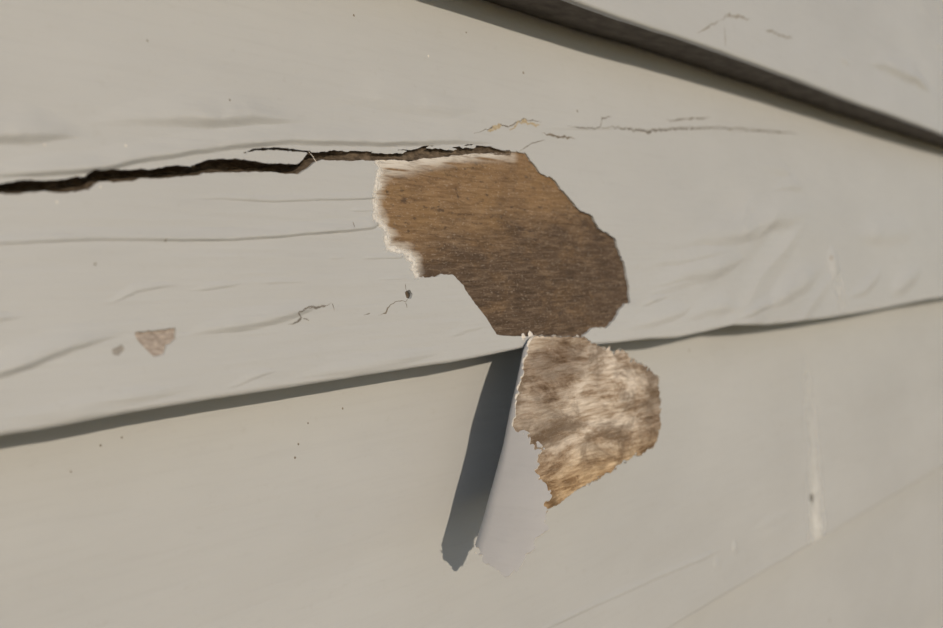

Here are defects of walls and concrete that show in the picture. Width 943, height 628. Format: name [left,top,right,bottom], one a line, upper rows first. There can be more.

crack [0,116,797,194]
peeling [135,328,174,357]
peeling [372,146,662,577]